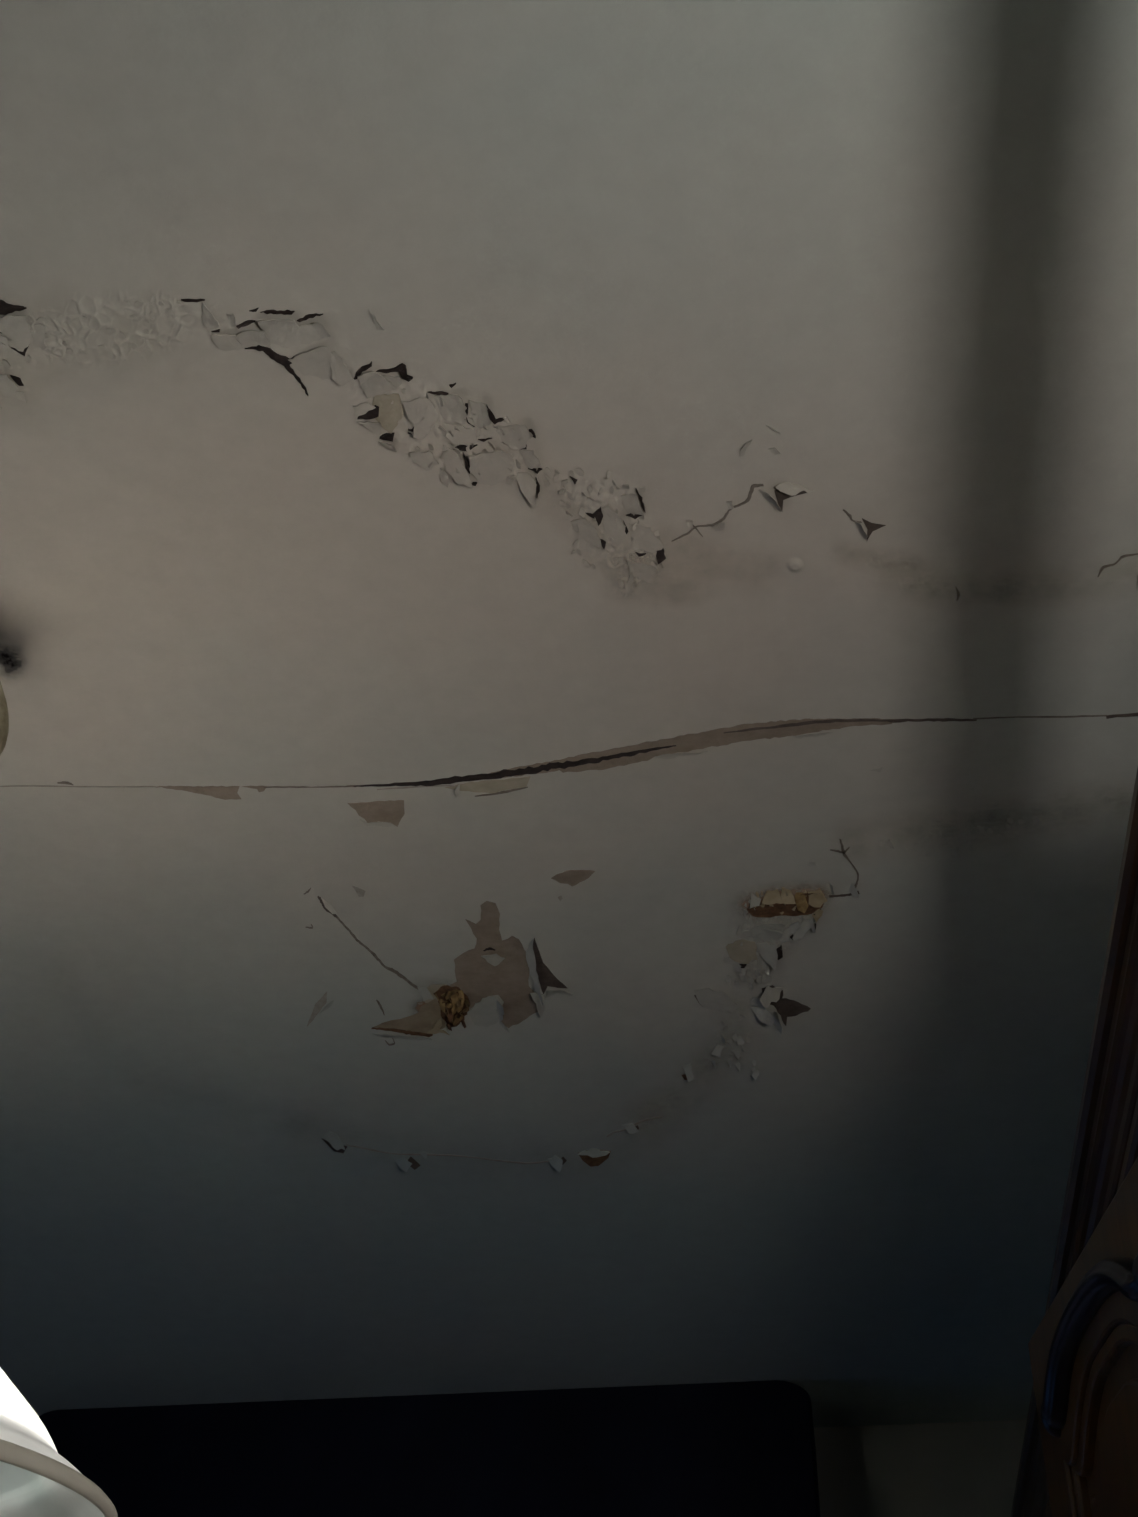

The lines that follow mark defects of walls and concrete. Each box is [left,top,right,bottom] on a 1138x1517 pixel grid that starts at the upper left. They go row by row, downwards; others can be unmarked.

peeling [0,296,53,410]
peeling [181,299,673,600]
crack [671,484,764,542]
peeling [843,509,886,540]
crack [0,713,1138,800]
peeling [348,800,405,827]
crack [304,888,418,989]
peeling [372,901,573,1046]
peeling [721,886,831,1035]